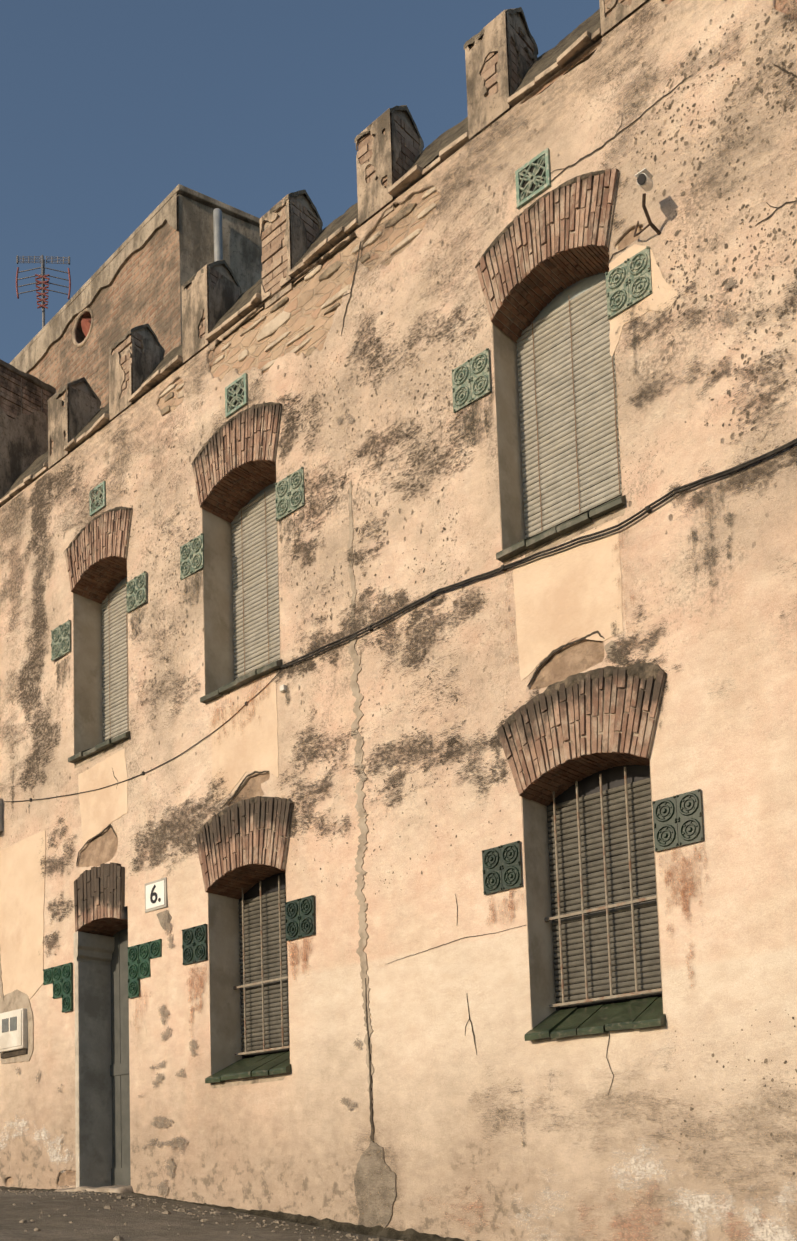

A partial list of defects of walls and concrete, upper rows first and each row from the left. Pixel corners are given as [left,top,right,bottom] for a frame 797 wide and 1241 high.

crack [550,74,693,182]
crack [755,200,797,226]
spalling [208,186,441,380]
spalling [530,640,604,690]
spalling [78,827,118,867]
crack [347,481,525,1228]
leakage [671,1093,797,1241]